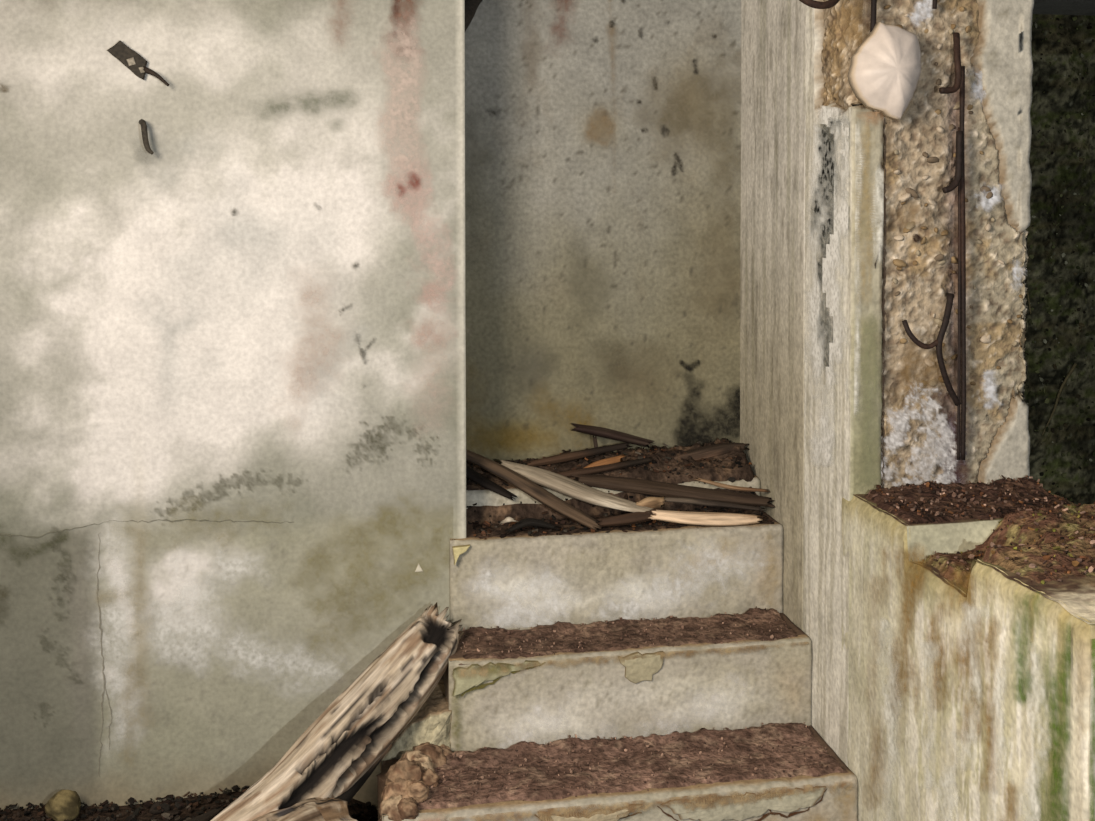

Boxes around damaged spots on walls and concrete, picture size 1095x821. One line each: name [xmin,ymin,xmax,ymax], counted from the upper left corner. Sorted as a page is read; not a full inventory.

spalling [821,0,1029,489]
water stain [808,106,965,486]
water stain [156,586,216,660]
water stain [230,637,337,675]
flaking render [452,645,767,696]
flaking render [421,782,851,821]
crack [620,806,678,821]
crack [755,789,827,821]